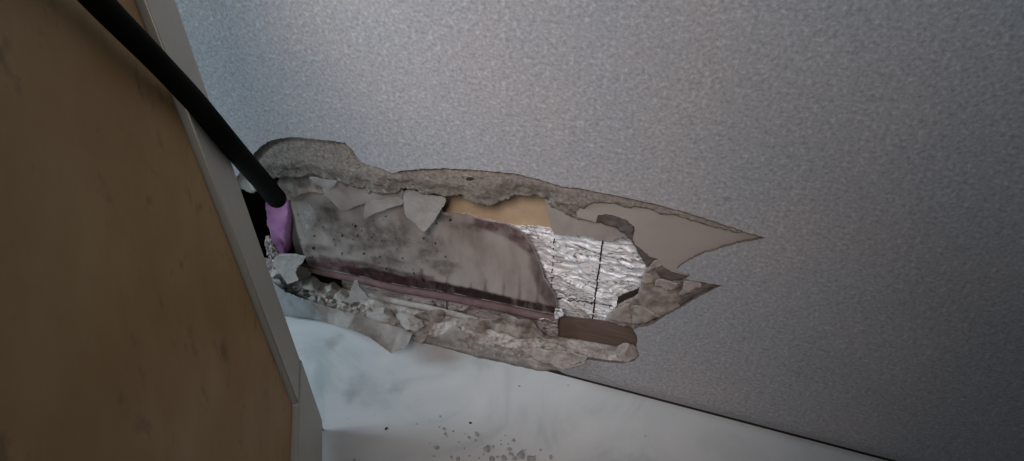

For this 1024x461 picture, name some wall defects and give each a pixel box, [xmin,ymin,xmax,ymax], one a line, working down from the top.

leakage [297,204,557,314]
flaking render [264,257,622,372]
flaking render [254,137,761,306]